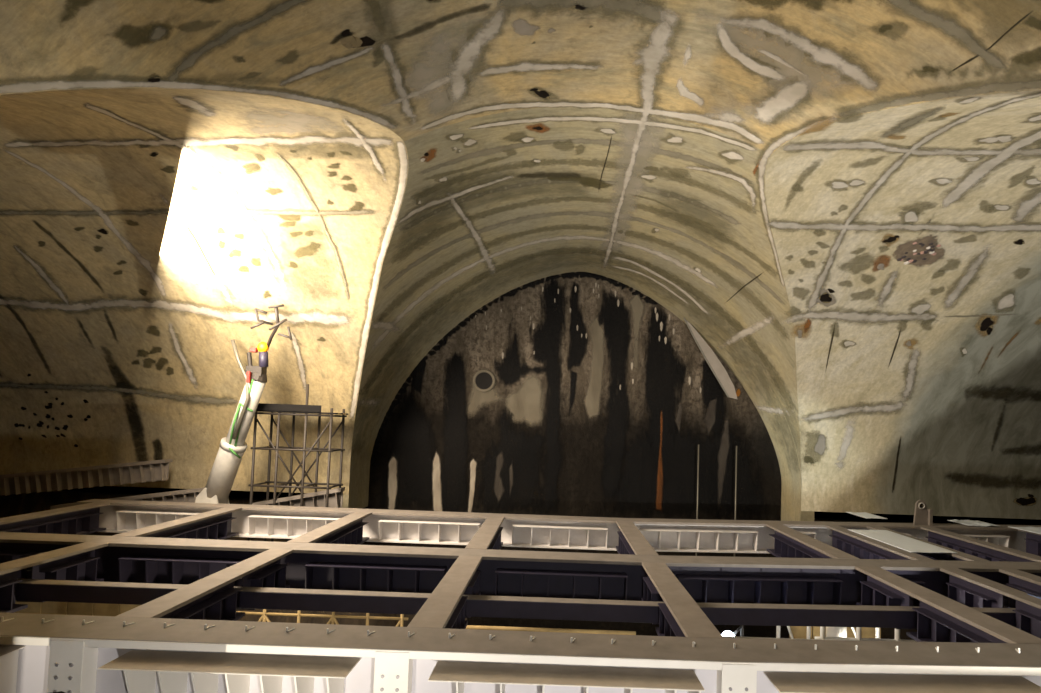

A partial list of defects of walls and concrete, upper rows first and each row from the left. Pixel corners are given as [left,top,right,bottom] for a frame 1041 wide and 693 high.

crack [953,12,1031,71]
corrosion [421,149,436,162]
corrosion [526,124,549,133]
water stain [0,0,1041,463]
spalling [882,234,945,267]
spalling [976,316,997,336]
spalling [14,391,91,447]
water stain [380,279,588,513]
water stain [598,290,768,520]